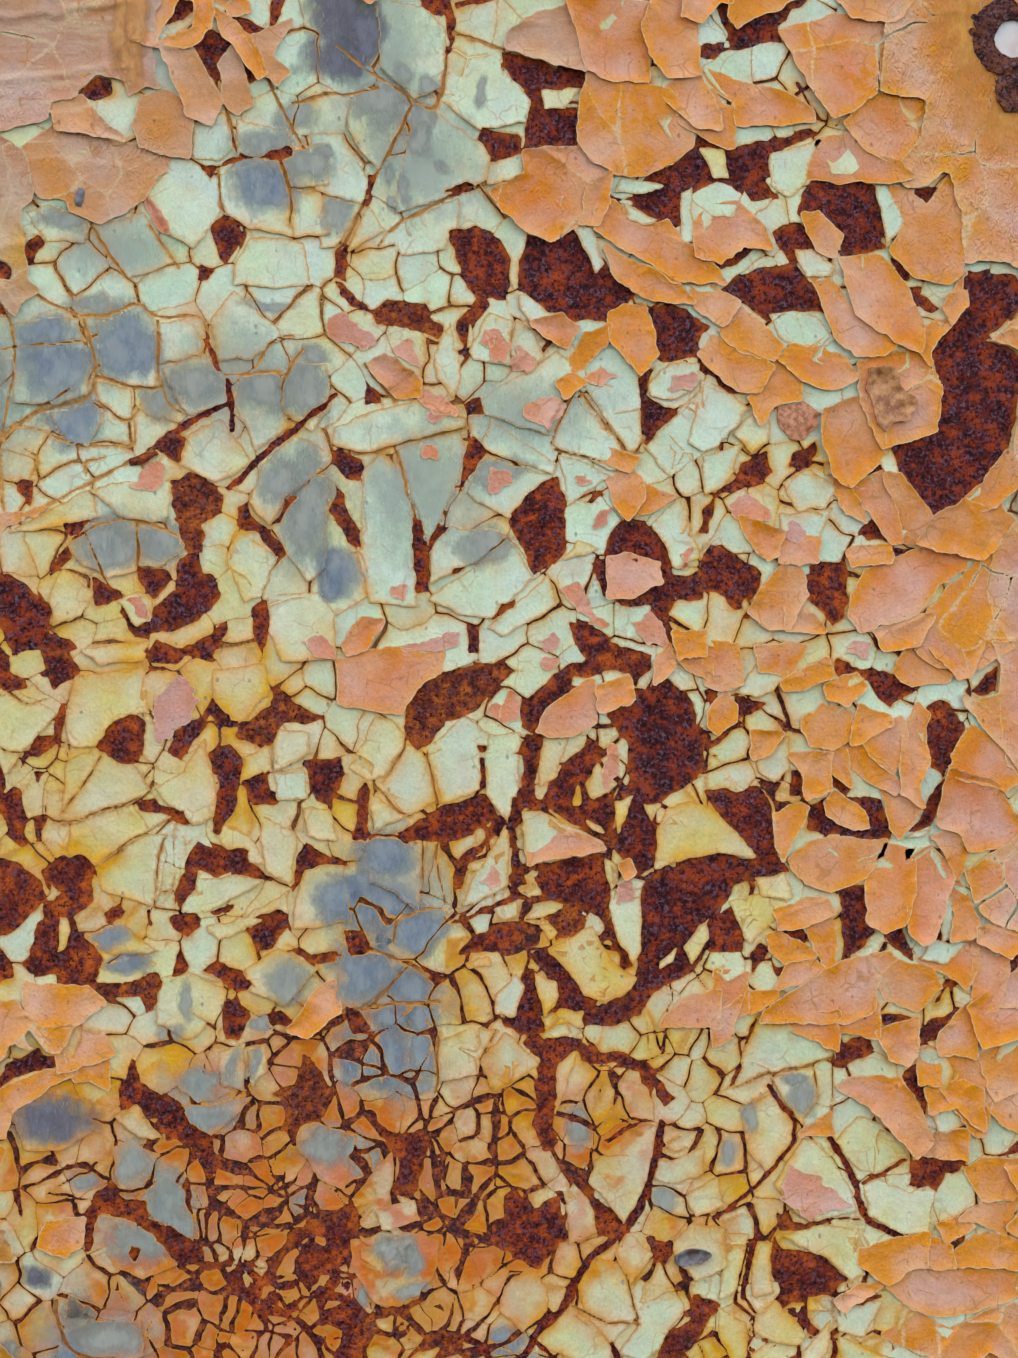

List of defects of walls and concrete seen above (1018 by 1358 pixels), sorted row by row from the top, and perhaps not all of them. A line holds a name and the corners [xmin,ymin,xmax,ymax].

peeling [13,290,332,451]
peeling [22,82,413,278]
crack [0,0,503,578]
corrosion [330,0,965,551]
crack [692,337,912,529]
corrosion [0,261,1018,1184]
crack [706,704,856,810]
corrosion [32,1035,497,1358]
crack [0,732,1018,1358]
peeling [740,1066,836,1171]
corrosion [591,1138,1018,1358]
peeling [856,1197,1018,1317]